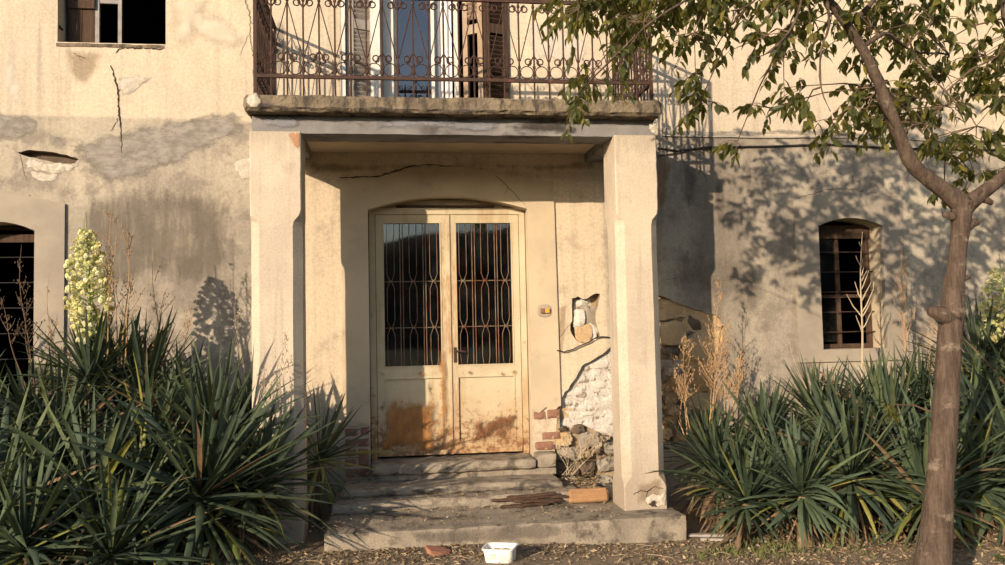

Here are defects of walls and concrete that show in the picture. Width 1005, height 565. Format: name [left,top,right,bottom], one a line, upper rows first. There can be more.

peeling [22,113,243,181]
crack [340,164,443,178]
spalling [570,294,598,344]
rust [382,355,446,452]
rust [466,415,516,444]